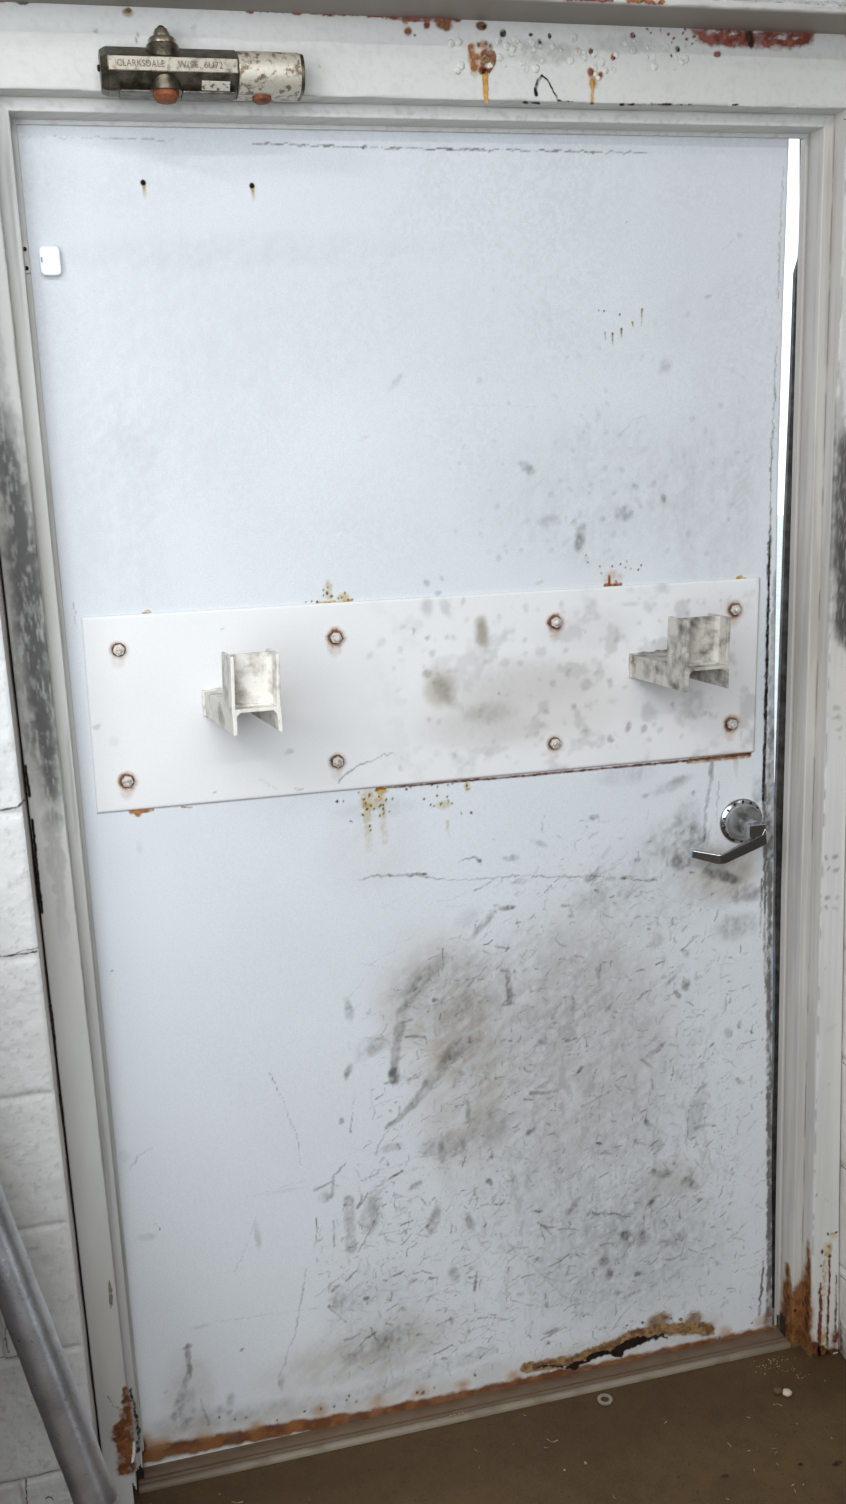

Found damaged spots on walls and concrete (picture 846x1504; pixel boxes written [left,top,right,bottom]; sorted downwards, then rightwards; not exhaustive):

corrosion [276,12,506,104]
corrosion [693,29,814,57]
corrosion [351,752,751,831]
corrosion [108,1231,842,1475]
peeling [531,1313,696,1364]